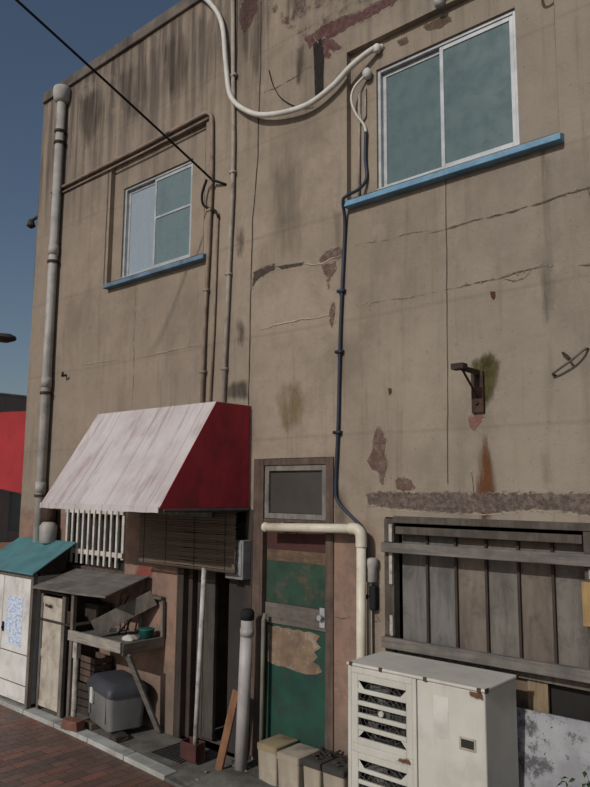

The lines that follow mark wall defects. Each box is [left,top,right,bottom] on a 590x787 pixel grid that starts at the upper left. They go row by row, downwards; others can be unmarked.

peeling [304,0,402,58]
crack [356,186,590,245]
peeling [251,262,304,289]
peeling [318,247,342,289]
crack [356,263,554,305]
peeling [329,300,337,328]
spalling [365,424,590,517]
corrosion [478,453,493,495]